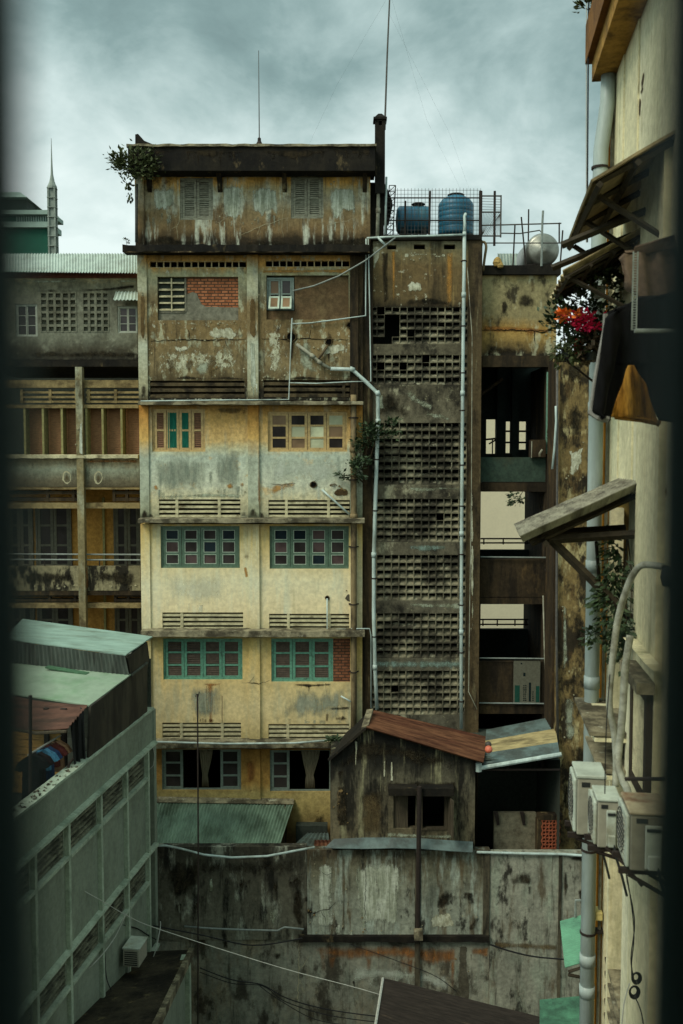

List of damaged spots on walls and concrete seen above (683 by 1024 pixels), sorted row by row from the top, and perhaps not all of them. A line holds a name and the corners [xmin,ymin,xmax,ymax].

peeling [140,292,259,372]
peeling [262,331,347,381]
leakage [570,409,580,435]
leakage [158,457,239,499]
leakage [34,573,72,587]
leakage [97,573,137,590]
leakage [339,742,443,781]
leakage [169,861,302,925]